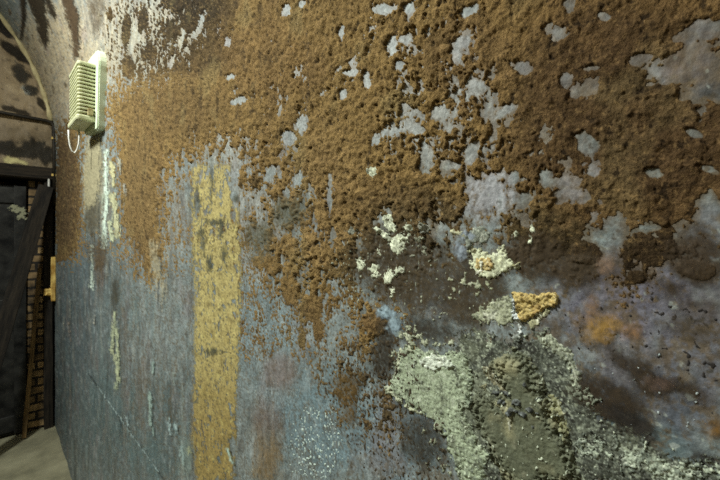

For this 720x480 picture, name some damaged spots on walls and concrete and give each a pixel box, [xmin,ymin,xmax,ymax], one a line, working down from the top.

corrosion [53,0,720,396]
corrosion [324,353,375,439]
corrosion [371,369,410,445]
water stain [322,220,508,480]
water stain [530,329,720,480]